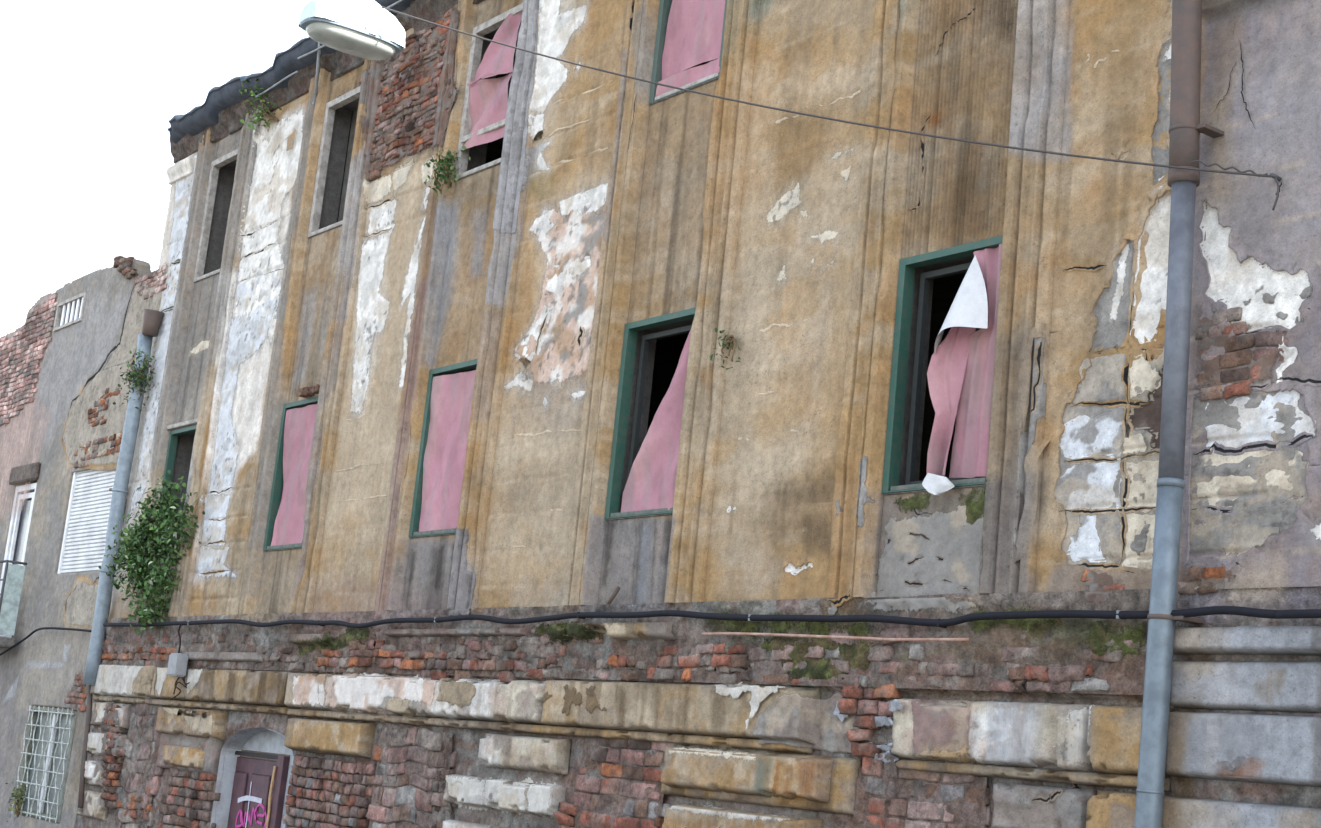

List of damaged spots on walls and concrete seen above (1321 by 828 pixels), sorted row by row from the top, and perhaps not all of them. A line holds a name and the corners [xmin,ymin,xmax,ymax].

crack [1214,38,1256,129]
crack [62,285,134,442]
peeling [62,155,197,528]
crack [161,305,174,313]
flaking render [191,340,210,354]
peeling [198,109,304,579]
flaking render [336,7,464,421]
peeling [493,0,608,407]
peeling [766,182,808,223]
peeling [810,230,842,244]
flaking render [1177,185,1321,595]
flaking render [606,641,971,773]